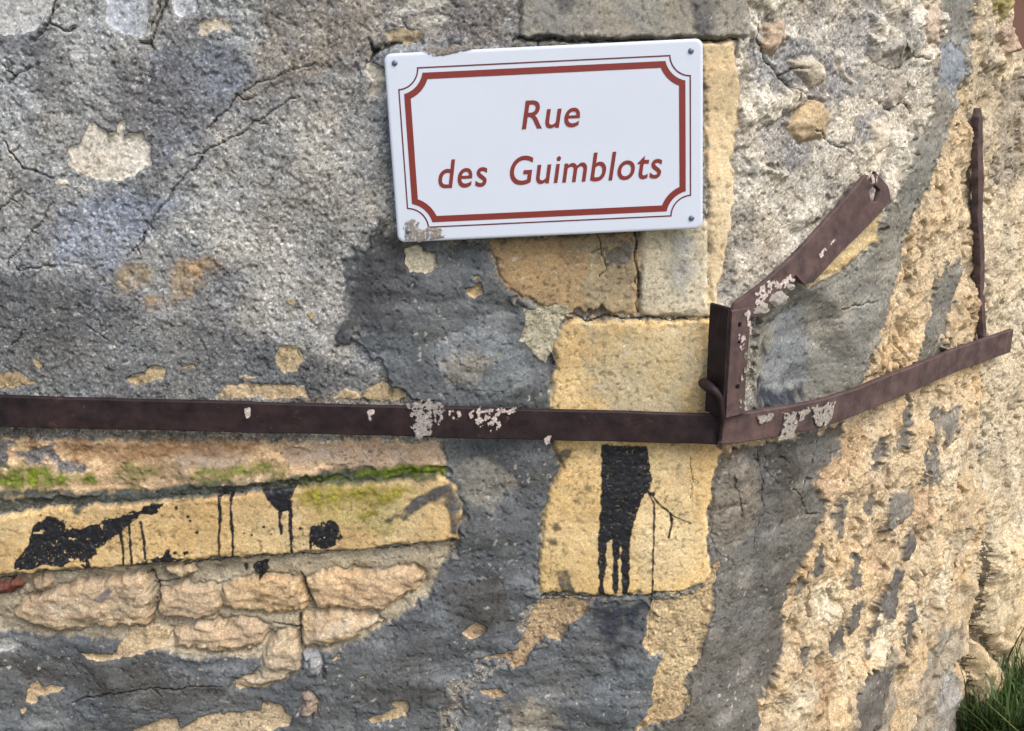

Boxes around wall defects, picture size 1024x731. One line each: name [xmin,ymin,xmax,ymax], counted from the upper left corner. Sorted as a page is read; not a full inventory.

crack [34,0,76,41]
crack [139,0,167,48]
crack [0,141,51,210]
spalling [55,120,152,191]
crack [127,64,313,257]
crack [8,204,54,271]
peeling [754,274,795,310]
spalling [519,304,572,363]
spalling [81,624,181,662]
spalling [467,596,589,669]
spalling [636,561,720,731]
spalling [133,701,292,731]